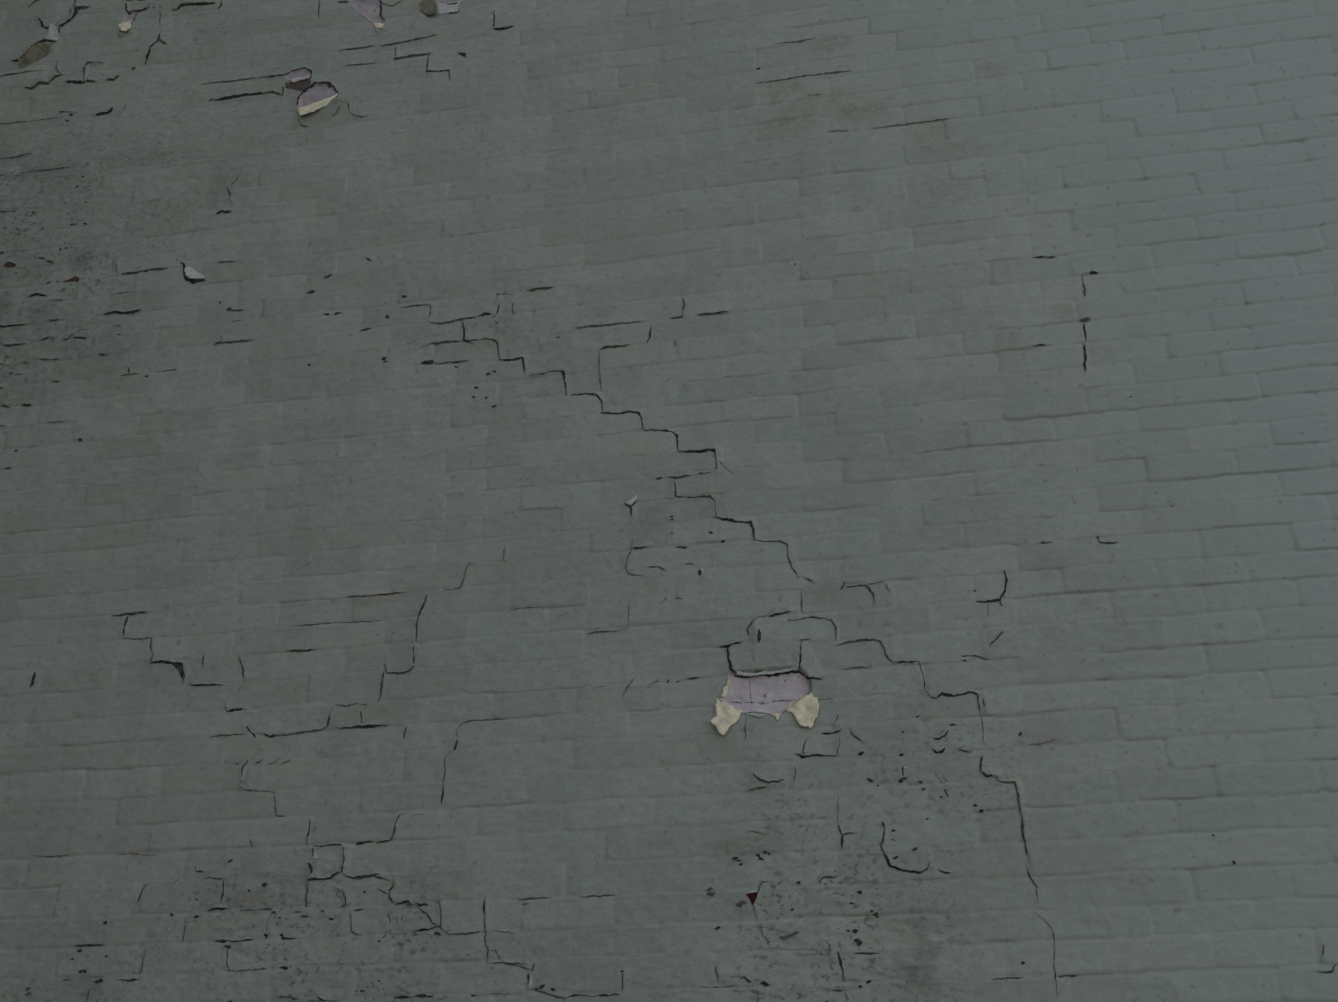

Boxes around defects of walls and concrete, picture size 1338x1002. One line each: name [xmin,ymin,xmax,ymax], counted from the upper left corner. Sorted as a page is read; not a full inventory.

peeling [12,0,89,73]
crack [0,0,222,176]
peeling [118,0,161,37]
crack [203,77,280,101]
peeling [258,65,366,127]
crack [341,34,450,80]
peeling [418,0,463,15]
peeling [181,262,205,284]
crack [1080,271,1098,370]
crack [400,284,1078,1002]
peeling [710,608,831,740]
crack [63,562,624,1002]